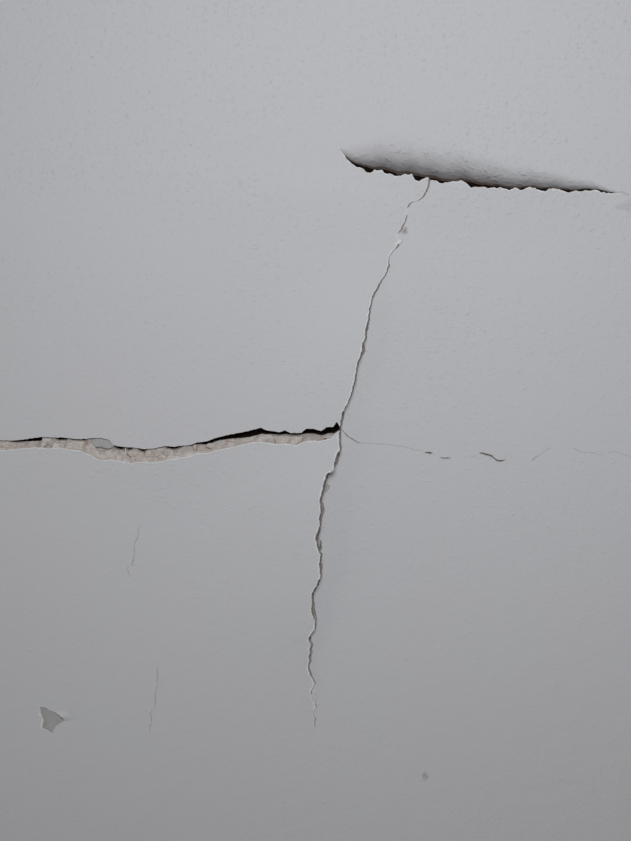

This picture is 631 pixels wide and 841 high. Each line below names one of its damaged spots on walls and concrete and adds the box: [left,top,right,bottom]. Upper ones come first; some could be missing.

spalling [38,707,74,734]
crack [0,130,631,733]